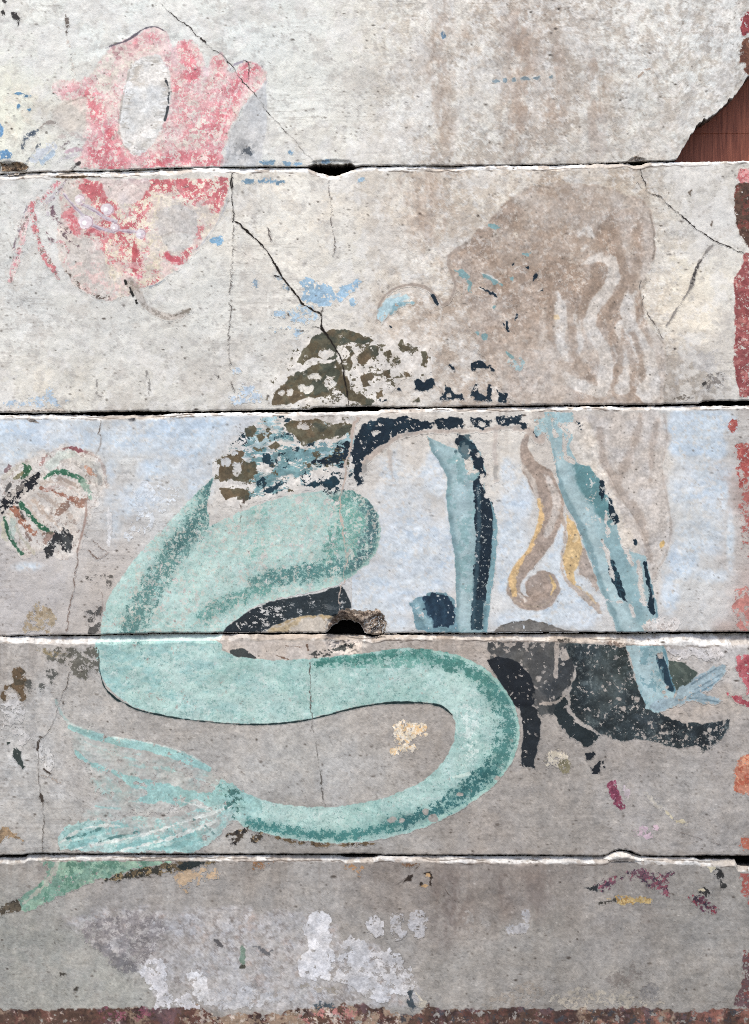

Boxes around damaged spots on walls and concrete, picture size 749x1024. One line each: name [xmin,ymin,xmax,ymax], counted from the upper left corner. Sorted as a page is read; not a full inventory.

peeling [739,11,749,75]
crack [161,3,336,257]
crack [636,169,748,256]
crack [638,279,664,339]
crack [227,172,361,610]
spalling [327,608,388,637]